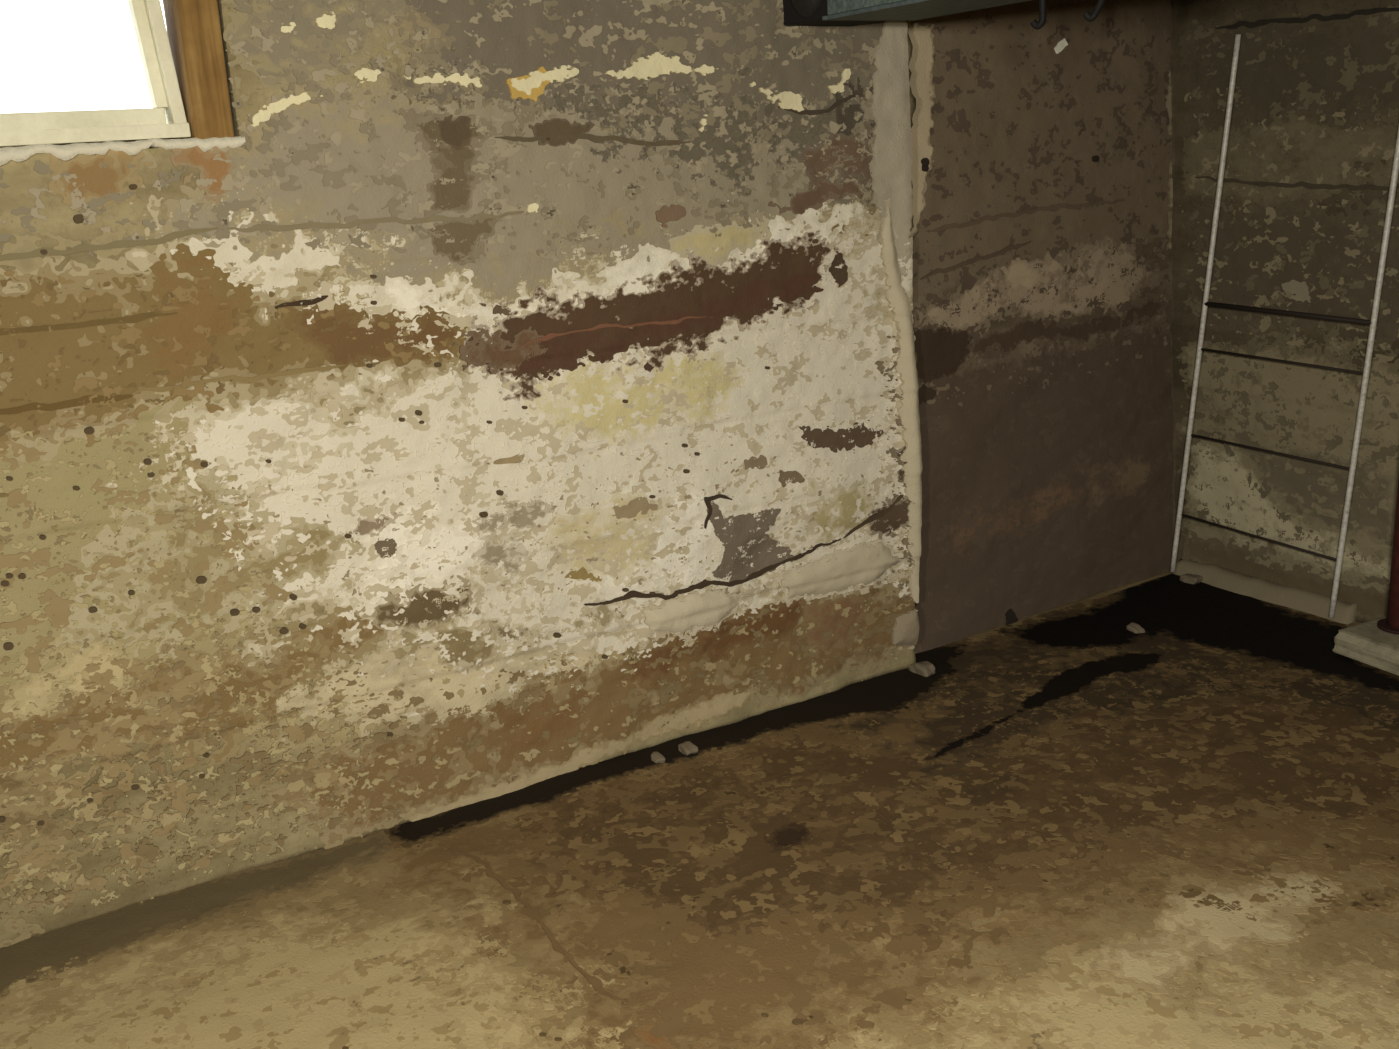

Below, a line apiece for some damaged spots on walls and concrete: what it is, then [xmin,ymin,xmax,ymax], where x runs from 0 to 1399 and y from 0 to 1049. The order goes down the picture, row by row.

peeling [280,22,296,33]
peeling [315,11,336,30]
peeling [251,92,323,127]
peeling [353,68,381,84]
peeling [403,73,482,88]
peeling [511,65,579,95]
damp [1176,0,1399,620]
spalling [465,434,840,628]
crack [584,494,904,606]
peeling [230,563,306,634]
damp [469,839,686,998]
damp [665,766,1399,1049]